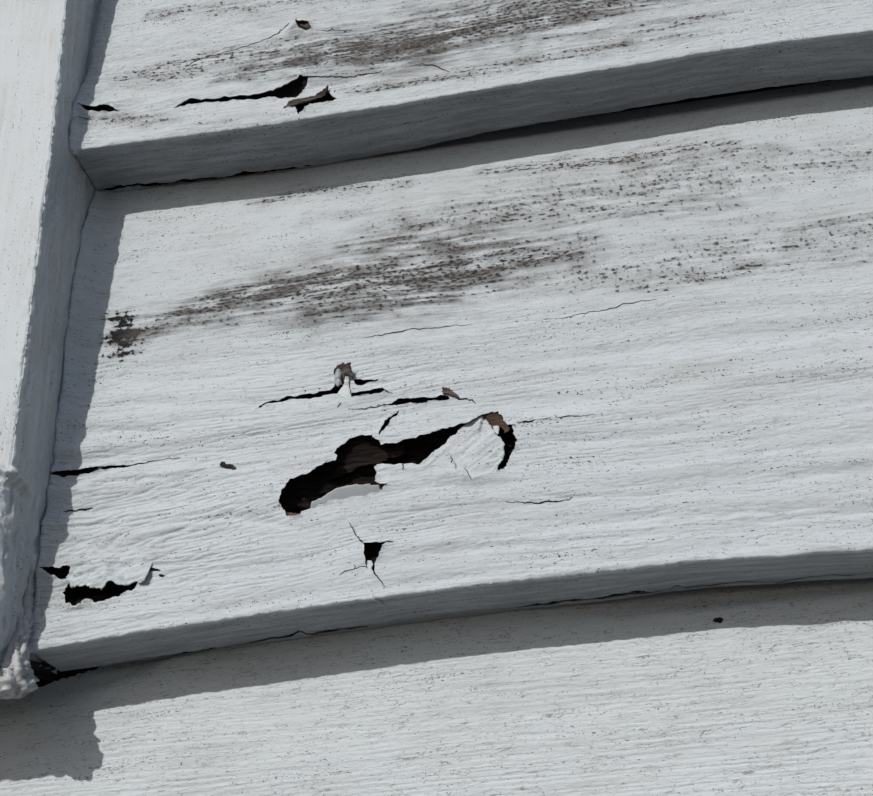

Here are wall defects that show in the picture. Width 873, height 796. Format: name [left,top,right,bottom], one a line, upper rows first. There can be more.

peeling [283,85,337,114]
mould [94,139,873,365]
crack [51,458,177,477]
peeling [278,411,518,516]
peeling [40,541,166,609]
peeling [340,523,392,588]